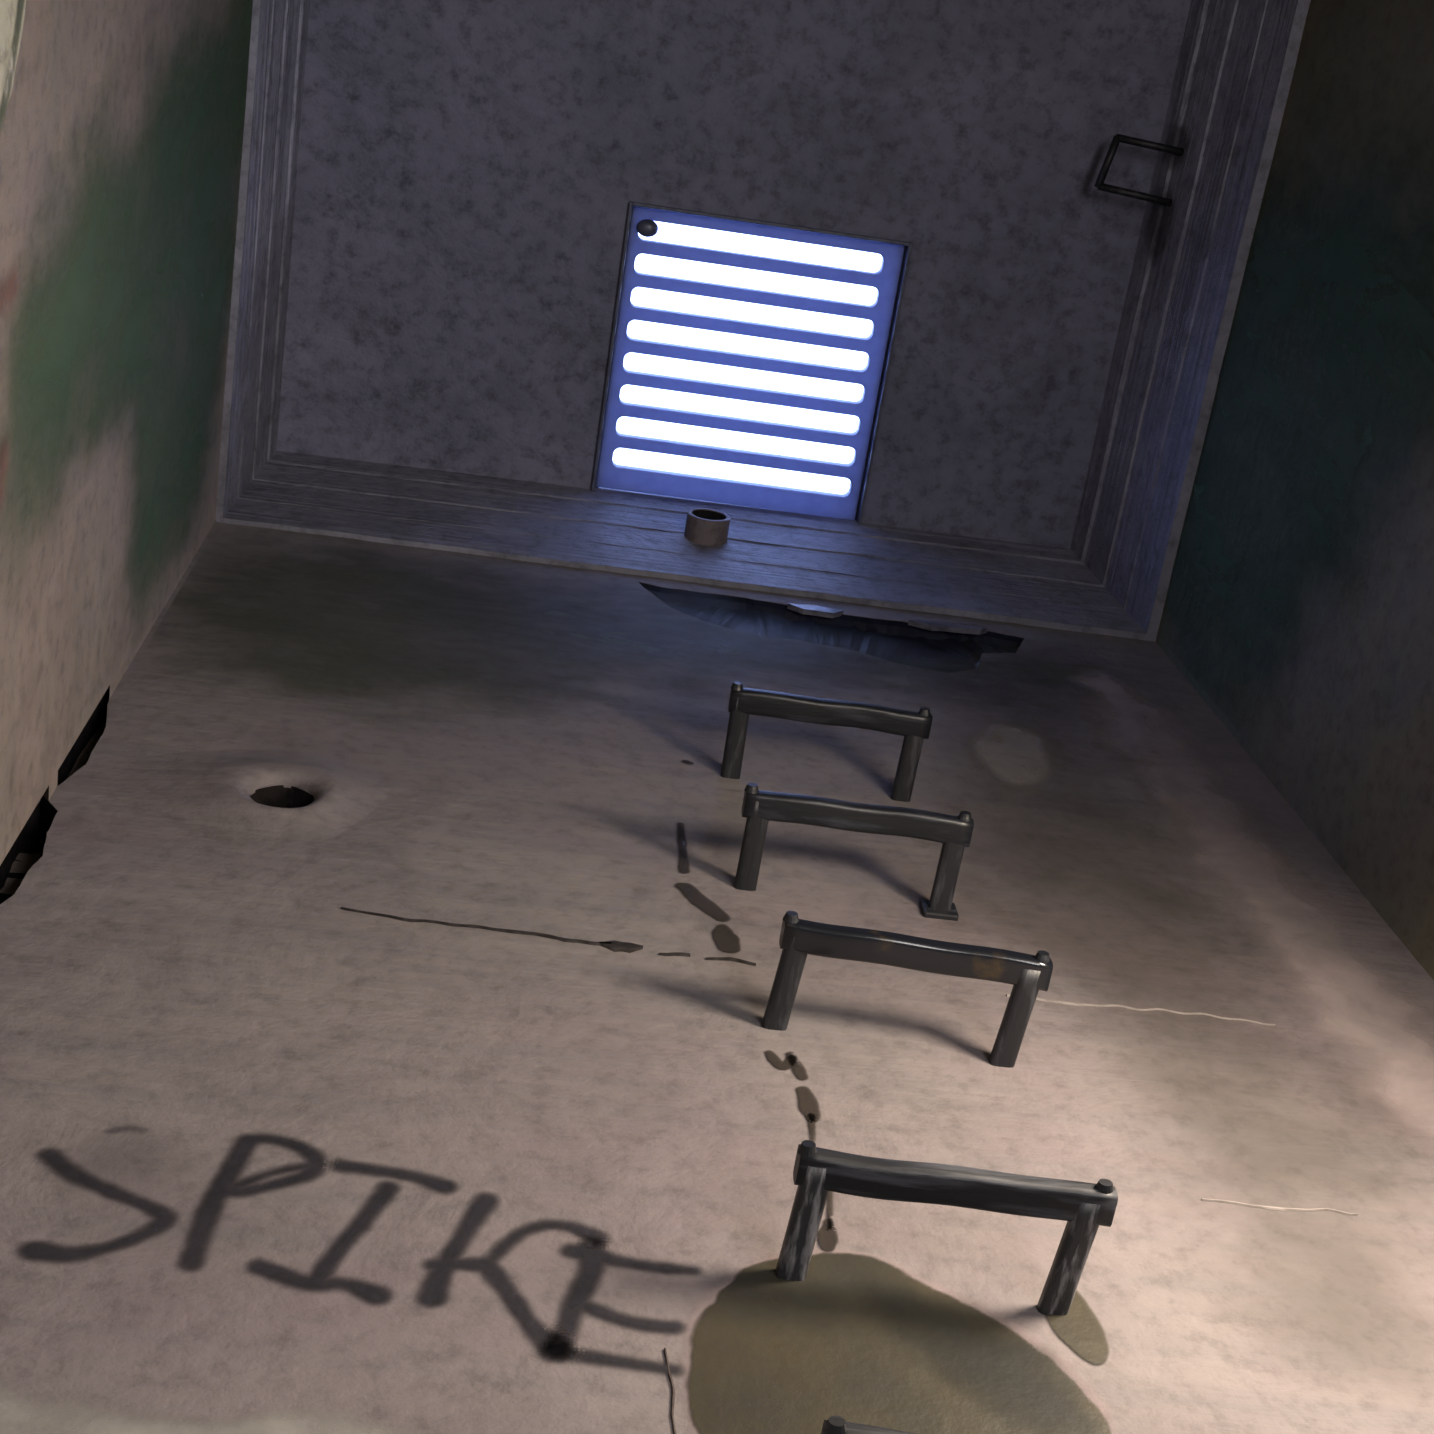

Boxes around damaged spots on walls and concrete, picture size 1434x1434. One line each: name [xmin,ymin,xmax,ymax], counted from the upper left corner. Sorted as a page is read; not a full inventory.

spalling [639,582,1024,673]
crack [341,907,756,966]
leakage [685,1191,1111,1434]